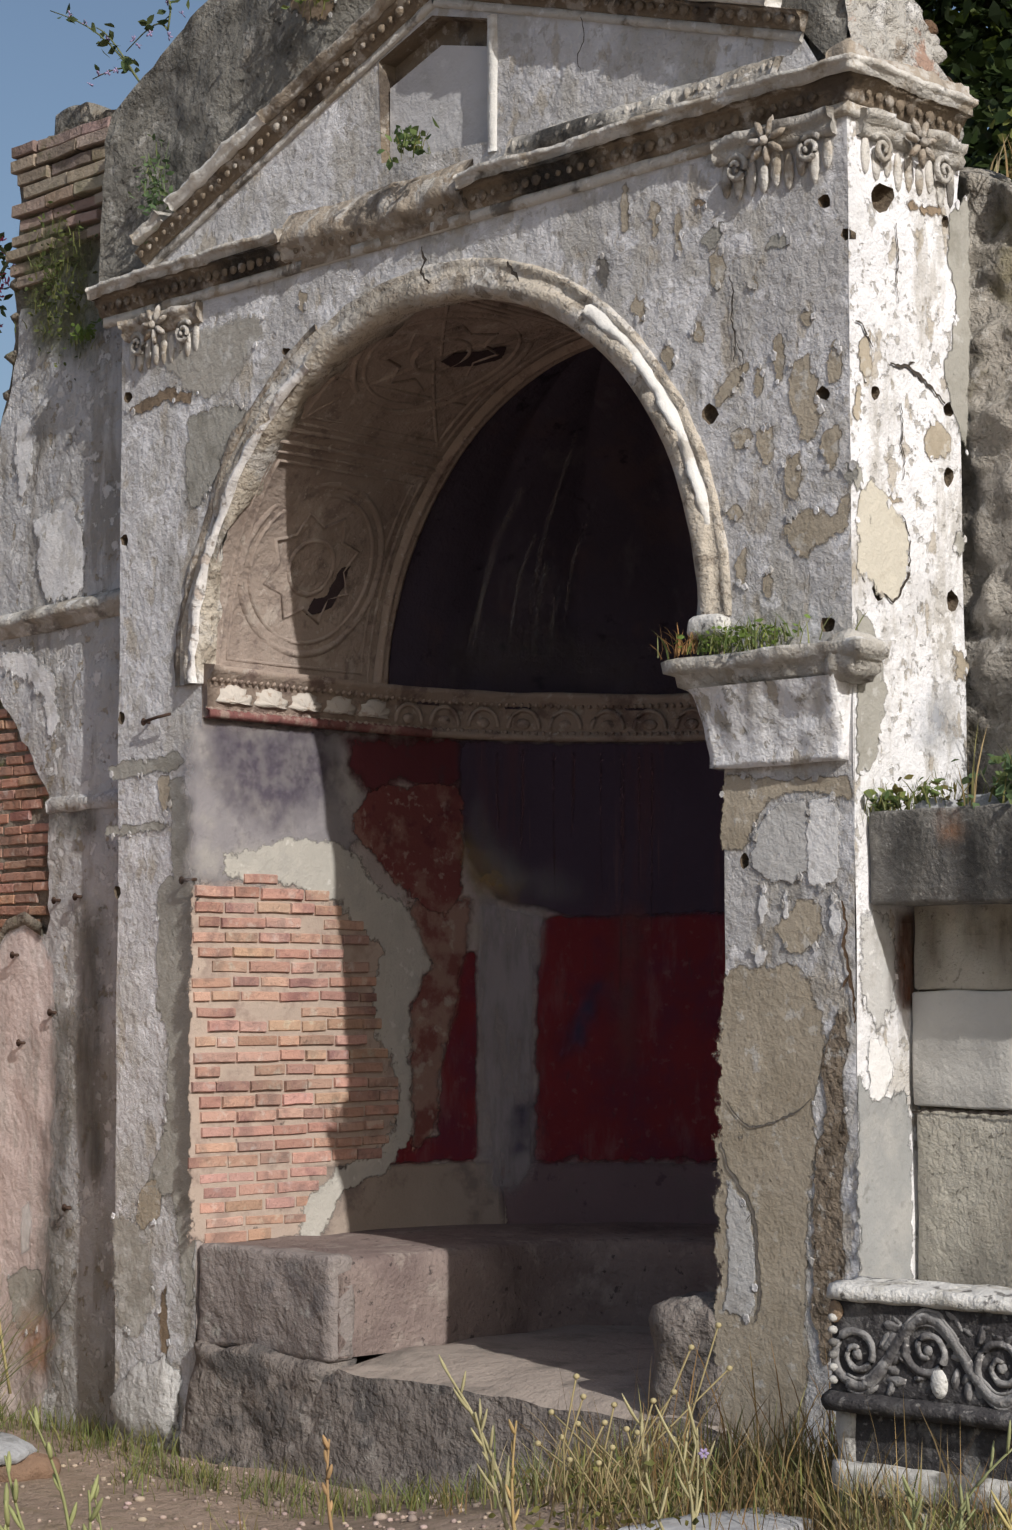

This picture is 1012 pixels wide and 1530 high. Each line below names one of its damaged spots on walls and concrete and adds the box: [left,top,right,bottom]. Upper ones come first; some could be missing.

spalling [845,0,949,81]
crack [893,223,901,304]
peeling [907,194,973,461]
crack [856,320,945,479]
peeling [714,330,910,601]
peeling [33,499,87,604]
crack [884,515,911,603]
spalling [953,531,967,556]
peeling [952,645,970,685]
water stain [219,733,332,806]
flaking render [105,724,472,1359]
peeling [712,662,917,1469]